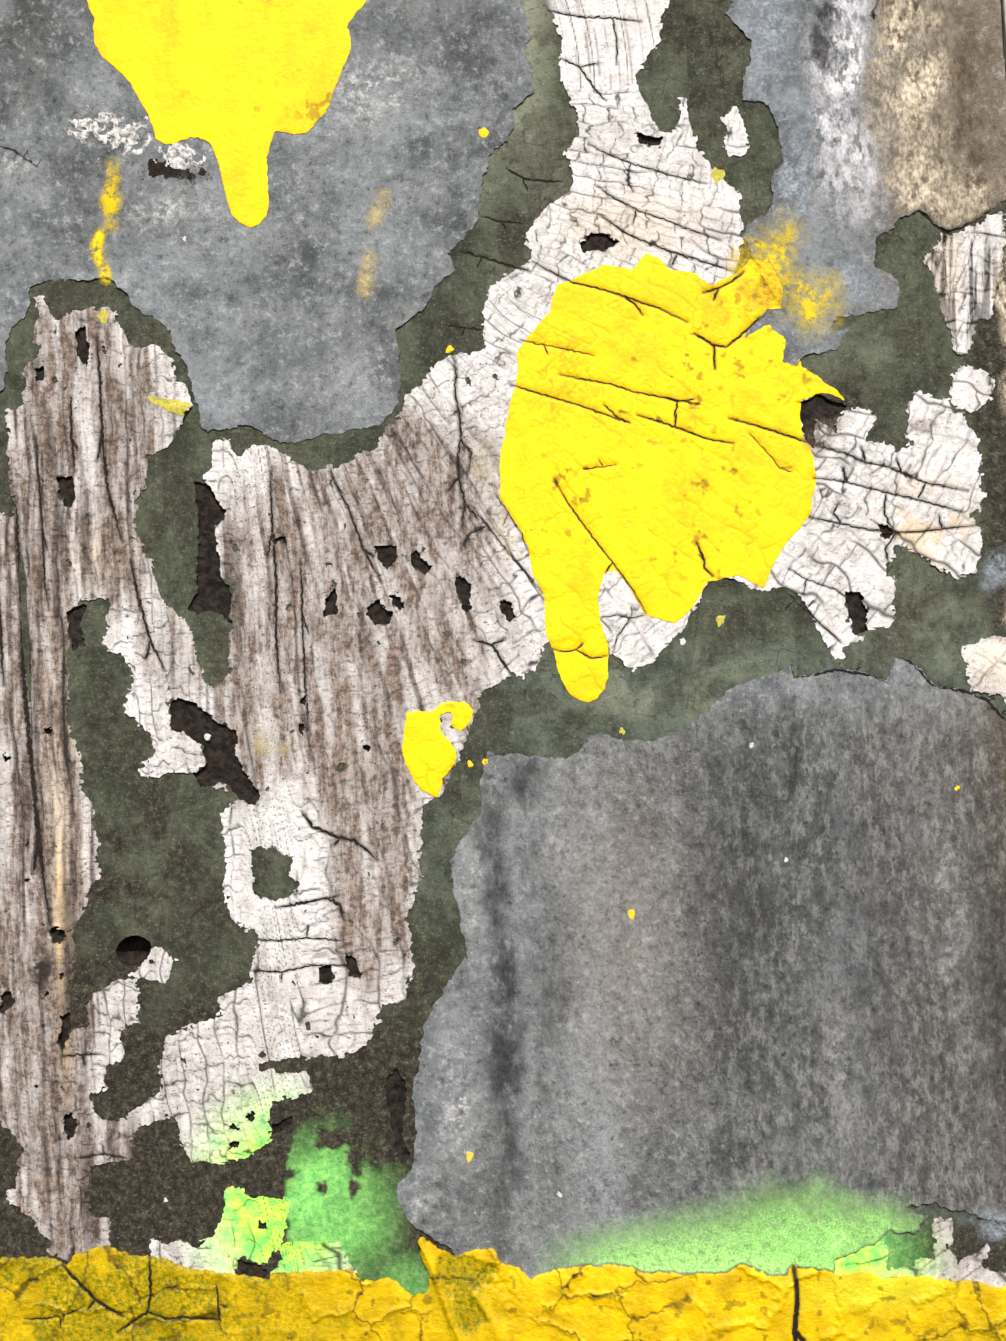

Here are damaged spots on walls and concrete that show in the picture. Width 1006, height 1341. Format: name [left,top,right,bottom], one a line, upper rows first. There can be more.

crack [506,168,563,191]
crack [457,216,765,368]
crack [592,145,743,299]
peeling [0,0,783,1296]
crack [552,490,646,659]
crack [697,543,713,576]
peeling [454,201,1006,802]
crack [512,340,974,561]
crack [26,1258,227,1332]
crack [792,1267,804,1341]